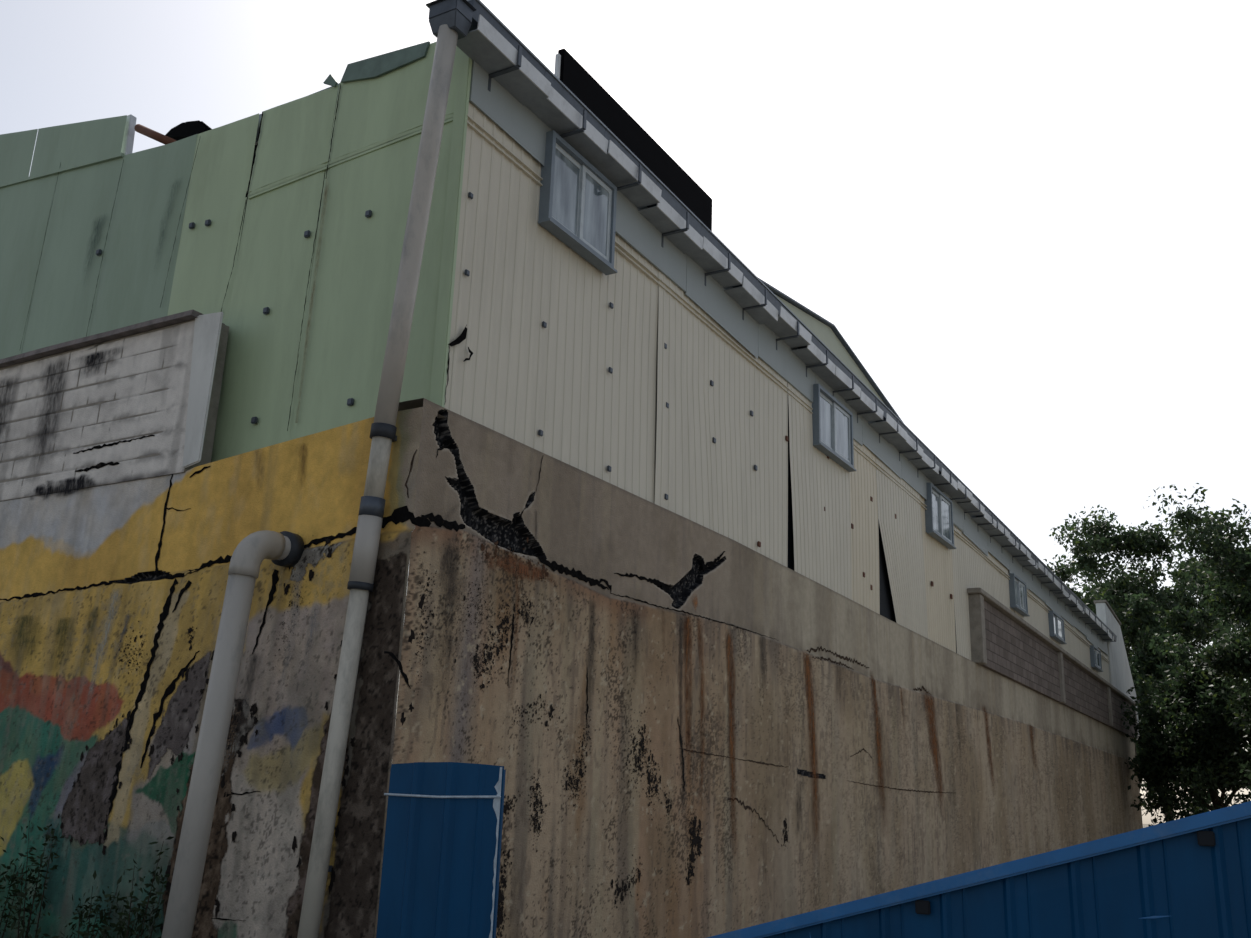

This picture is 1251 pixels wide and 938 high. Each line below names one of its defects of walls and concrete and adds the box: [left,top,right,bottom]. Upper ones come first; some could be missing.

damp [40,364,63,452]
damp [35,475,94,498]
damp [85,345,115,371]
crack [0,466,232,838]
peeling [192,699,258,938]
crack [252,569,279,654]
peeling [269,538,342,671]
peeling [285,702,331,938]
crack [304,409,775,639]
rust [727,633,735,807]
rust [805,654,817,830]
rust [925,695,942,796]